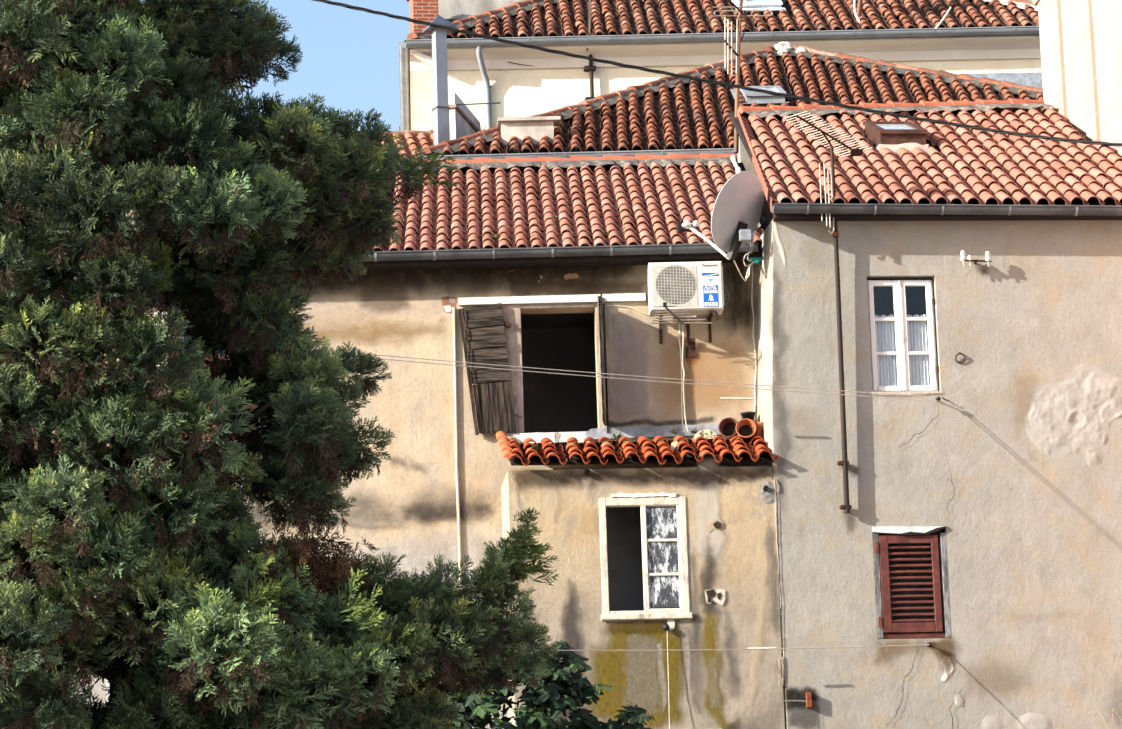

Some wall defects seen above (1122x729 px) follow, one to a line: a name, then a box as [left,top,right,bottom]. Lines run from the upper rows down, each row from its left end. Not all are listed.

leakage [241,485,271,526]
leakage [415,500,487,520]
leakage [515,459,766,682]
leakage [657,644,667,707]
crack [887,642,920,728]